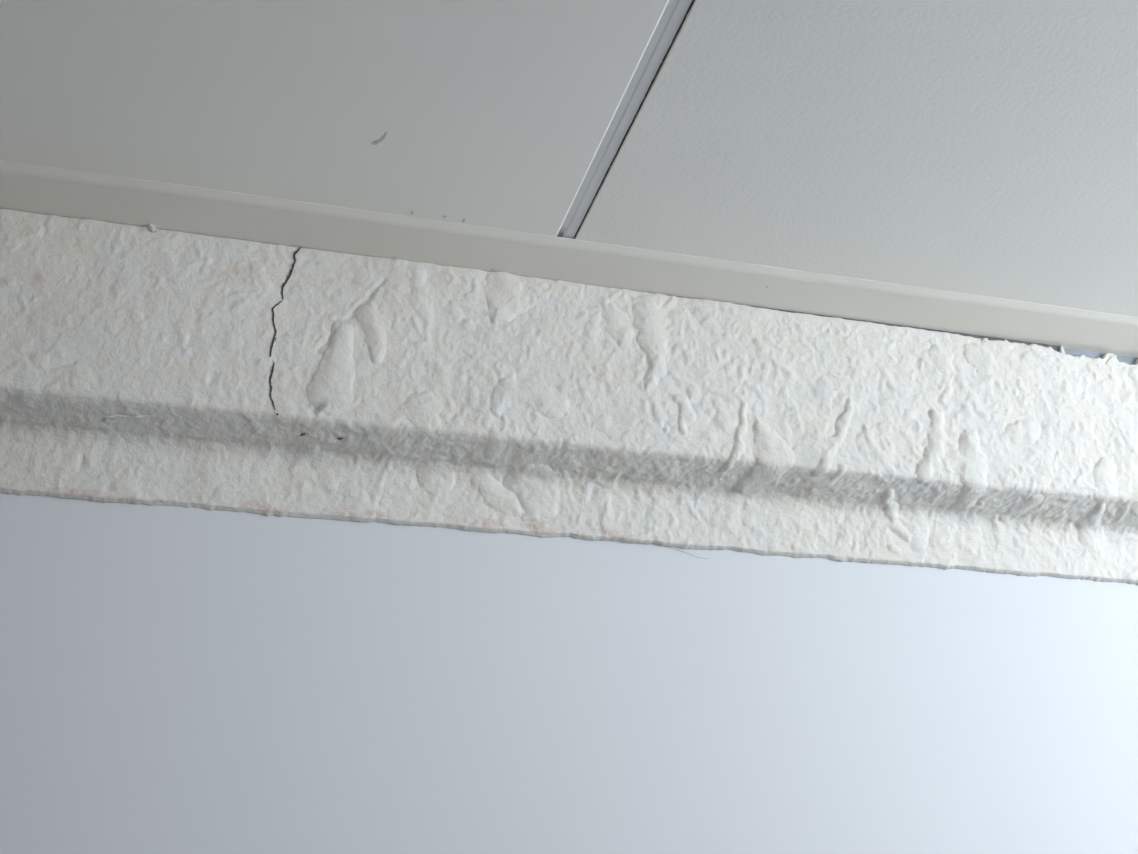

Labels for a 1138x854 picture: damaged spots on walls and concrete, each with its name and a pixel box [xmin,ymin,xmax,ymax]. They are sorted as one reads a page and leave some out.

crack [269,247,302,415]